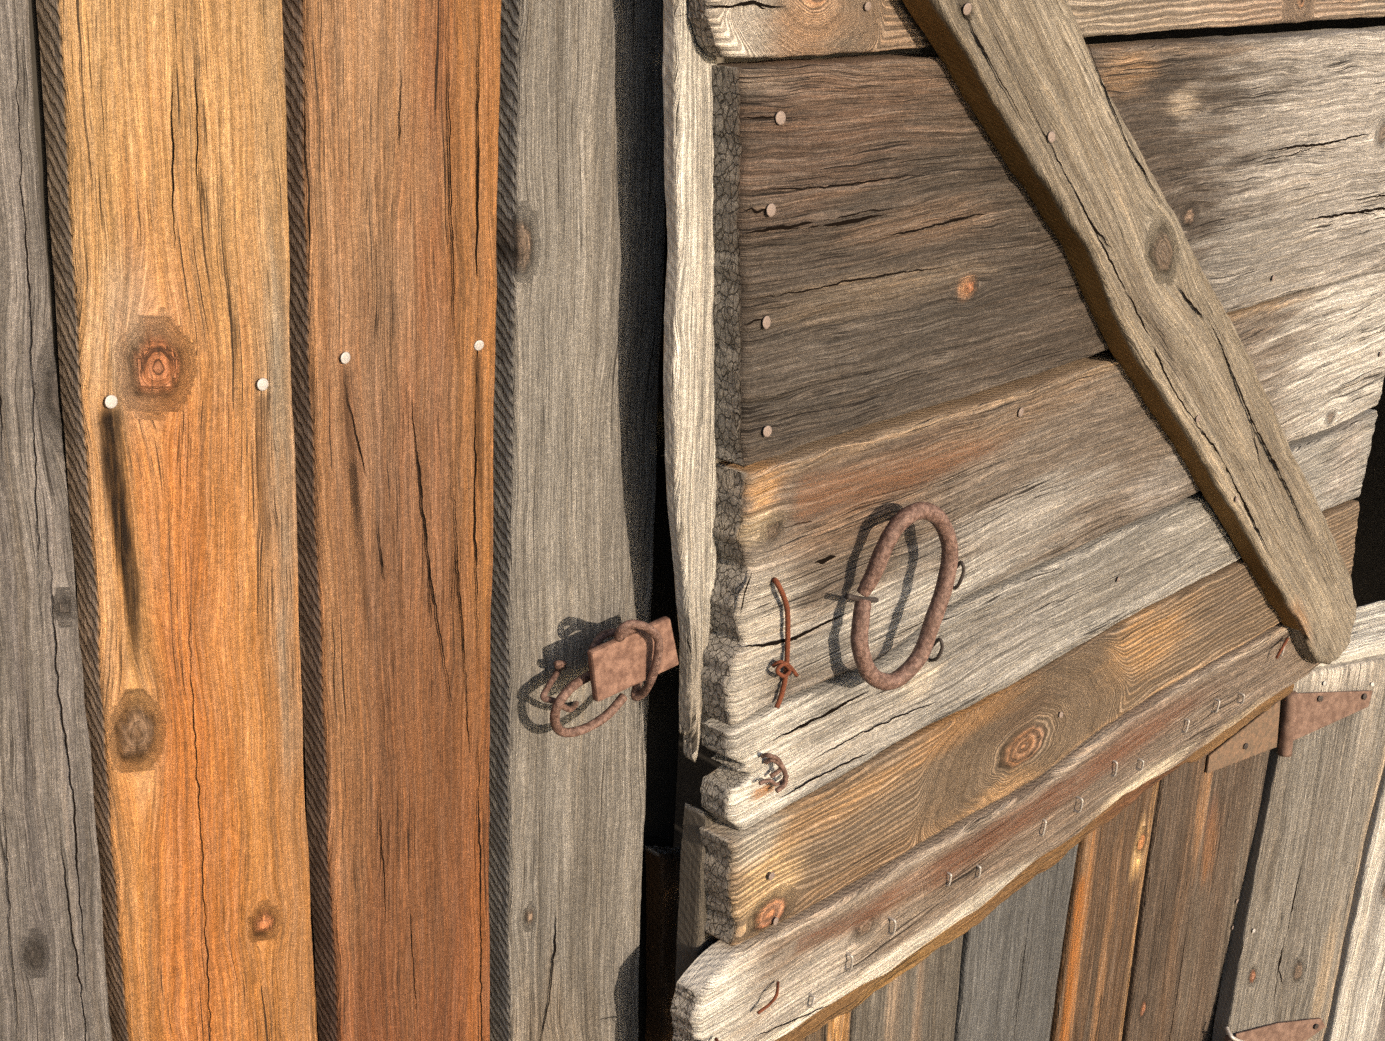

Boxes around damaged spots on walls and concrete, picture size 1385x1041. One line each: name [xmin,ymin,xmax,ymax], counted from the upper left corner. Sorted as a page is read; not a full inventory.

crack [1263,133,1372,161]
crack [745,172,988,236]
crack [746,266,949,327]